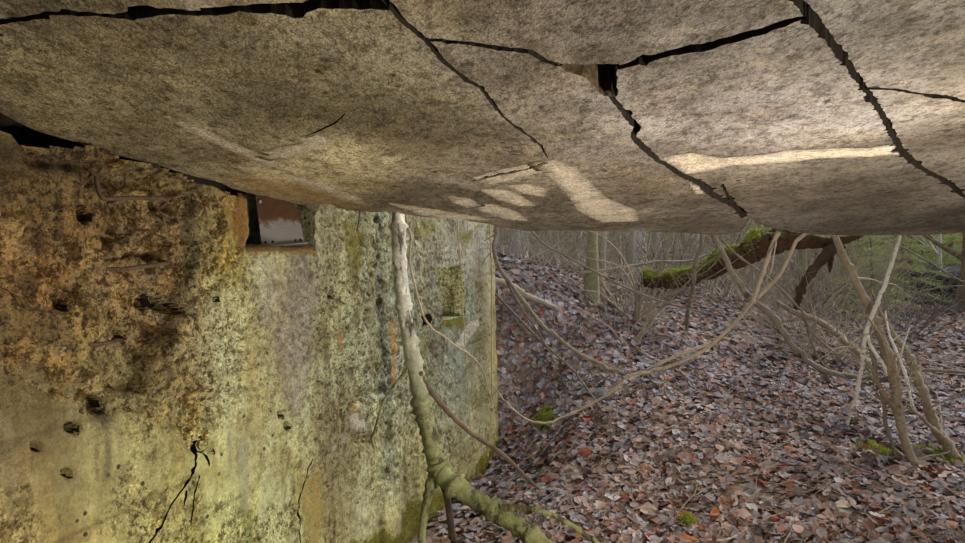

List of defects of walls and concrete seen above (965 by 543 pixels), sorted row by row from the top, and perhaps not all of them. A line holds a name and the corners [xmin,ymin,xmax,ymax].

crack [0,0,563,181]
crack [604,0,965,218]
spalling [0,211,83,312]
crack [148,435,210,543]